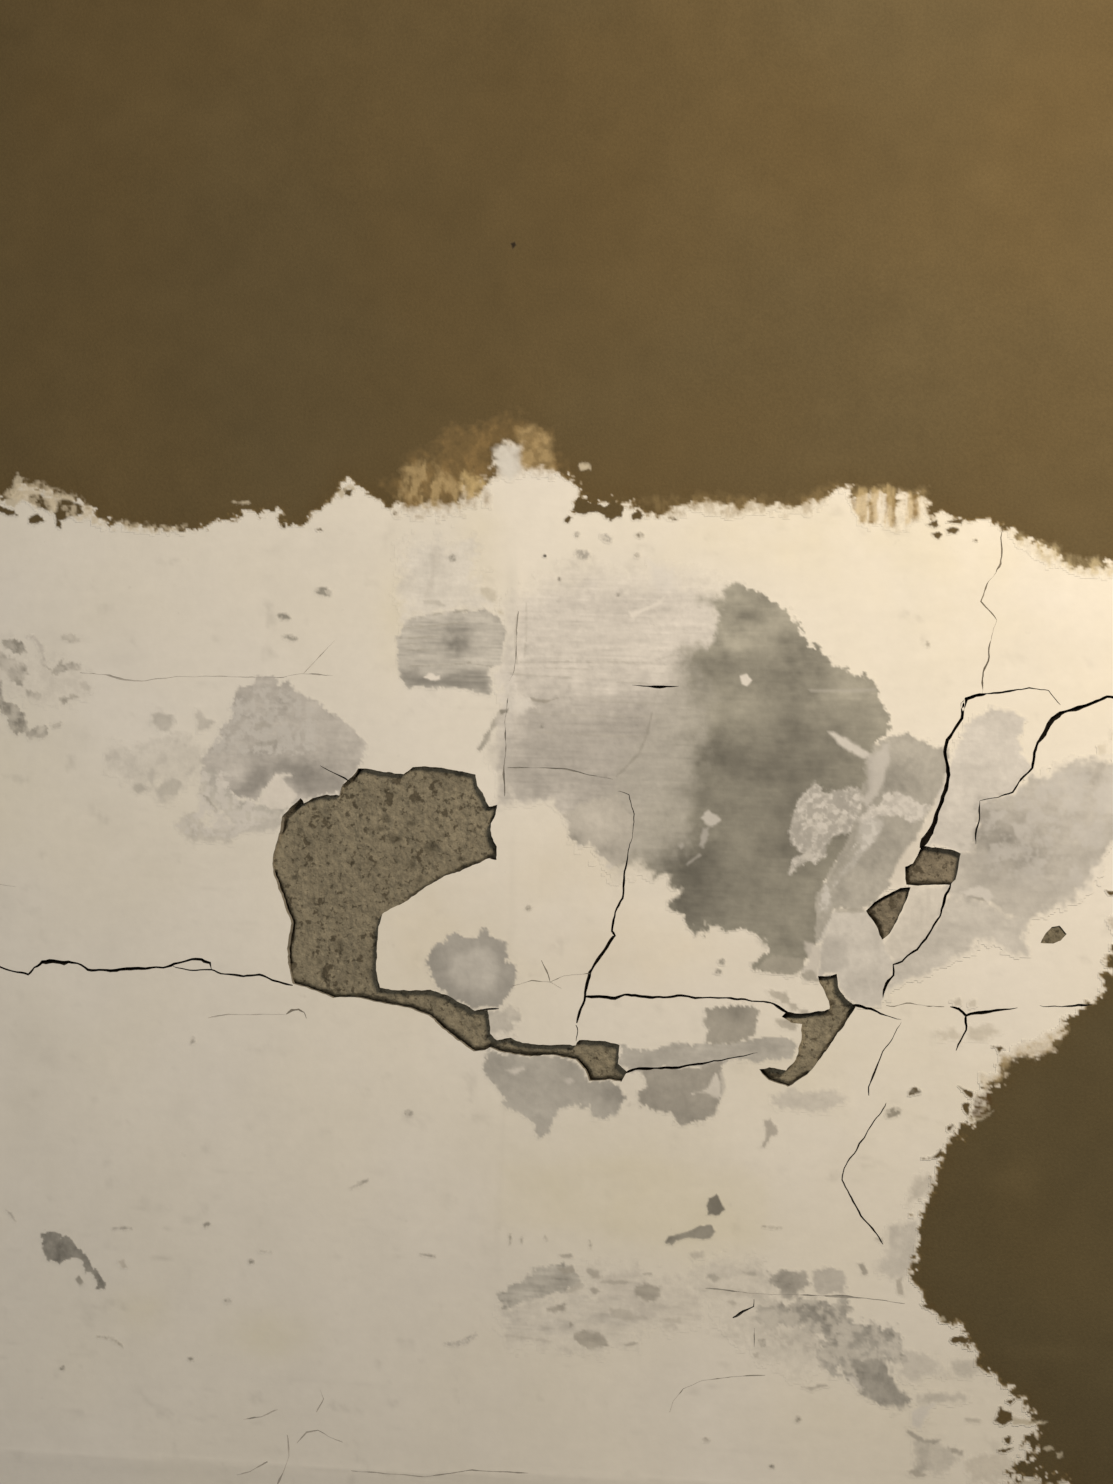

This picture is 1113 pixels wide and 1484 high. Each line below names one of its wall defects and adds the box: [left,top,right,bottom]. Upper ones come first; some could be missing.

damp [391,421,592,517]
crack [0,958,306,1018]
peeling [102,524,1113,1148]
crack [480,611,789,1039]
crack [626,1053,753,1073]
crack [842,883,1091,1244]
crack [920,527,1113,849]
peeling [39,1229,107,1291]